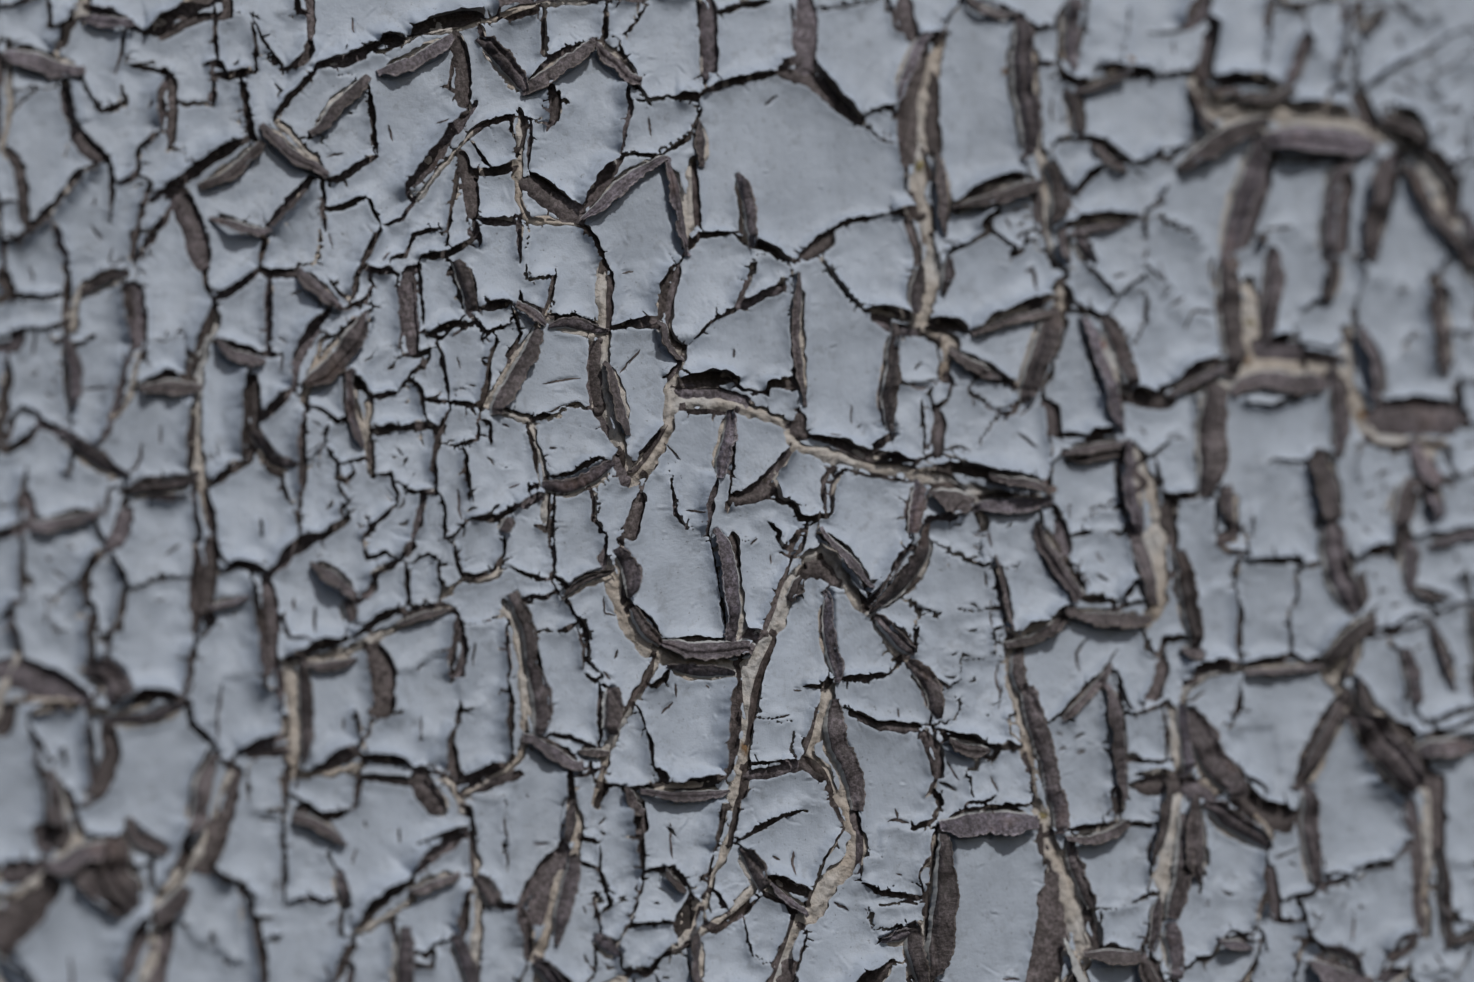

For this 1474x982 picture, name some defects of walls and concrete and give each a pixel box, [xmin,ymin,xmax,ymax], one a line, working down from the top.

peeling [0,0,806,982]
crack [0,0,1168,982]
peeling [410,0,1474,982]
crack [1119,261,1223,603]
crack [1032,0,1473,197]
crack [1210,488,1340,608]
crack [1235,157,1474,508]
crack [1381,111,1418,229]
crack [1348,513,1474,565]
crack [1442,126,1474,223]
crack [1036,626,1223,982]
crack [1182,571,1474,982]